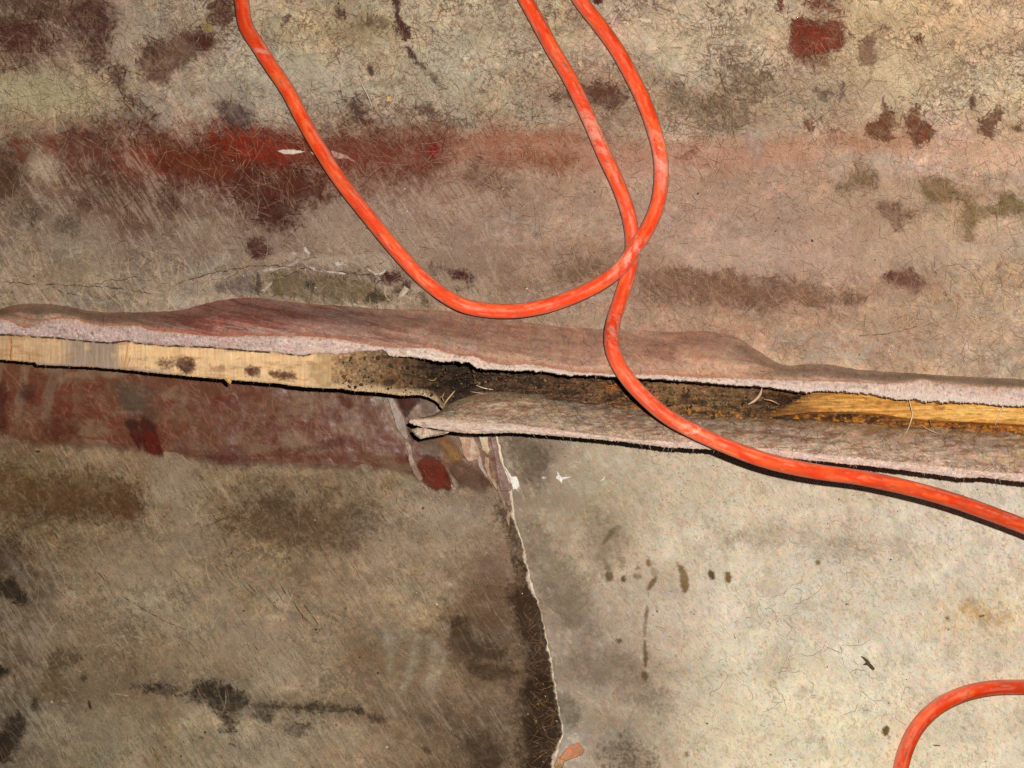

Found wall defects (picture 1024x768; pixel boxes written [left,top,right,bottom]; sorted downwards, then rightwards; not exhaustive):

peeling [256,246,352,292]
peeling [366,259,431,302]
peeling [387,396,520,526]
water stain [0,465,142,604]
water stain [606,572,656,589]
water stain [679,566,689,592]
water stain [400,509,580,768]
water stain [0,699,37,763]
water stain [144,680,384,733]